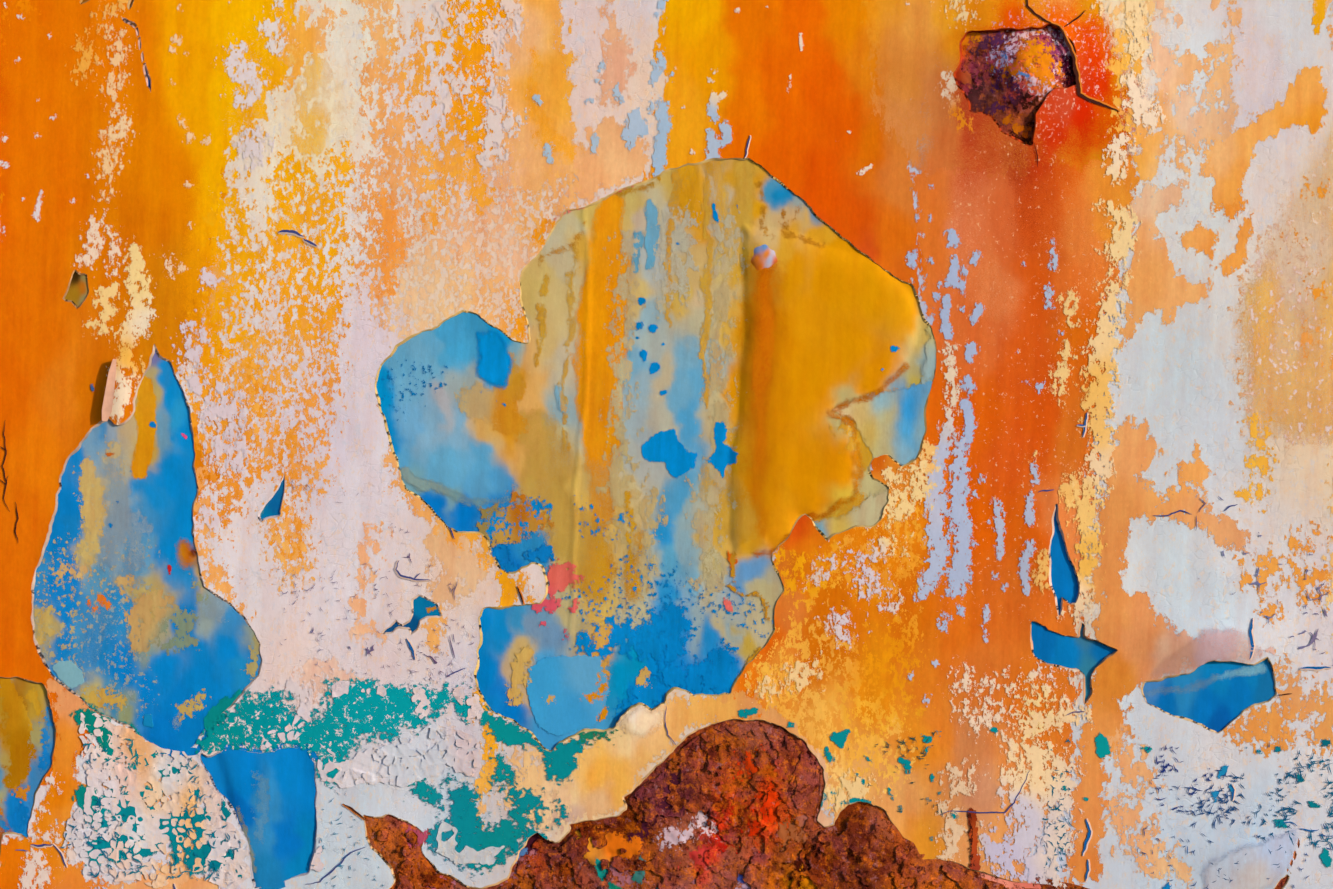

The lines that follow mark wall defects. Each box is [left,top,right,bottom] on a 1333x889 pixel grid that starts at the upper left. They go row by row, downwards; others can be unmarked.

rust [0,0,656,889]
peeling [0,0,992,889]
rust [363,0,1333,889]
peeling [926,0,1170,889]
peeling [1141,657,1277,734]
peeling [1211,765,1233,803]
peeling [1273,819,1300,873]
peeling [1320,848,1333,869]